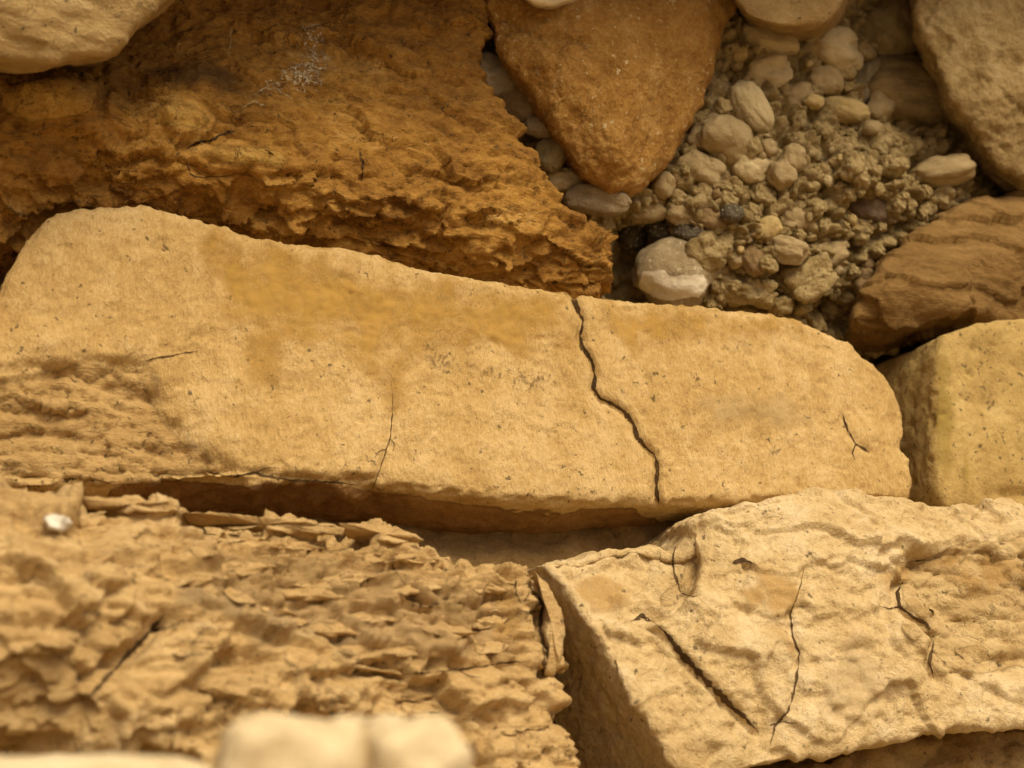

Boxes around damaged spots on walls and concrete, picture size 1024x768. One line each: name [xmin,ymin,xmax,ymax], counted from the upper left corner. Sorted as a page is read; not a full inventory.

crack [211,383,395,491]
crack [564,293,660,503]
crack [843,415,870,459]
crack [632,570,804,746]
crack [880,556,941,678]